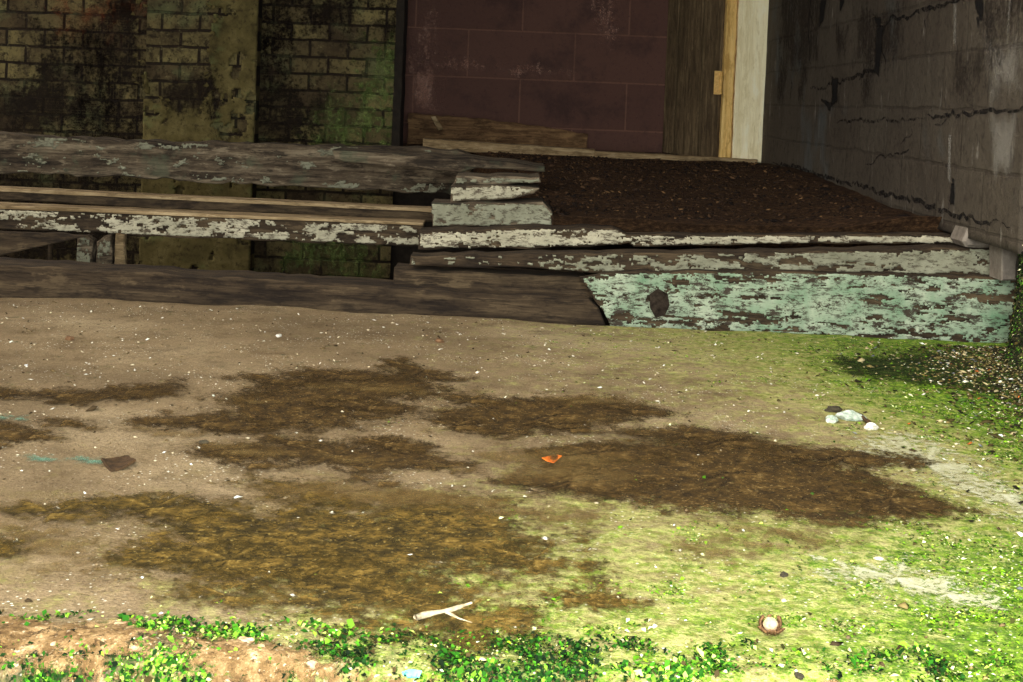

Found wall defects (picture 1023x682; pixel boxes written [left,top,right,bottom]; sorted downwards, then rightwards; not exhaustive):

water stain [0,0,147,140]
water stain [162,60,223,120]
water stain [258,0,396,145]
crack [779,0,969,99]
peeling [9,138,150,177]
peeling [134,142,248,183]
crack [773,104,1023,228]
peeling [0,178,1017,343]